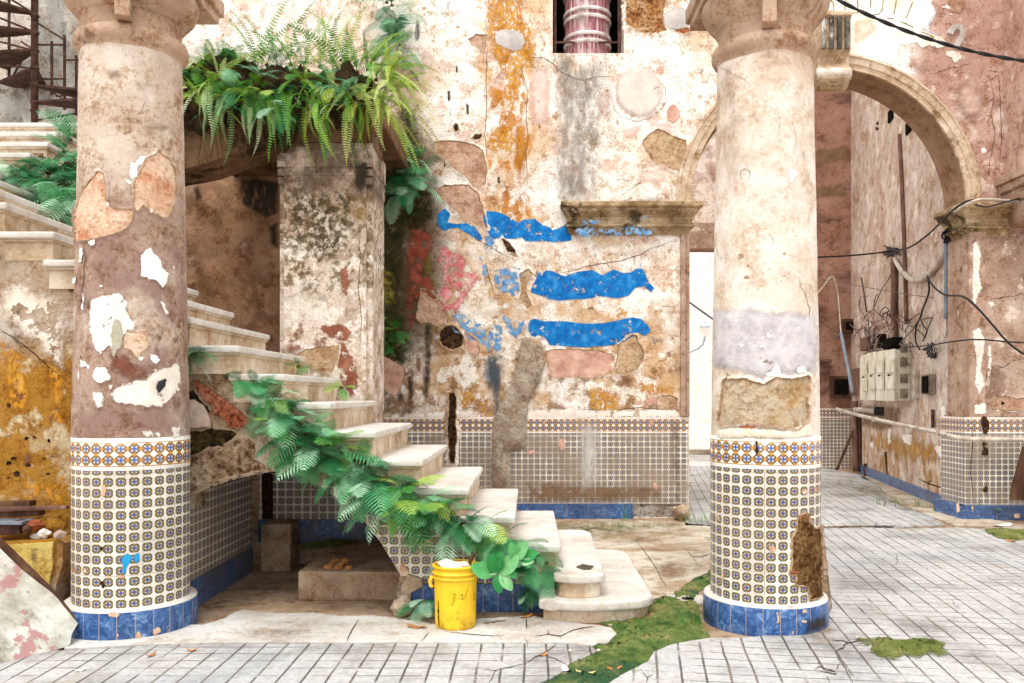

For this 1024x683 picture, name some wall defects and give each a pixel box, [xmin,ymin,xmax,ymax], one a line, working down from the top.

spalling [71,145,179,262]
peeling [340,268,349,295]
spalling [431,121,553,316]
corrosion [486,0,536,174]
leakage [565,65,595,192]
peeling [596,240,669,256]
spalling [624,125,690,183]
spalling [78,285,274,519]
spalling [295,324,358,396]
spalling [542,333,648,386]
spalling [715,364,813,432]
spalling [776,512,824,634]